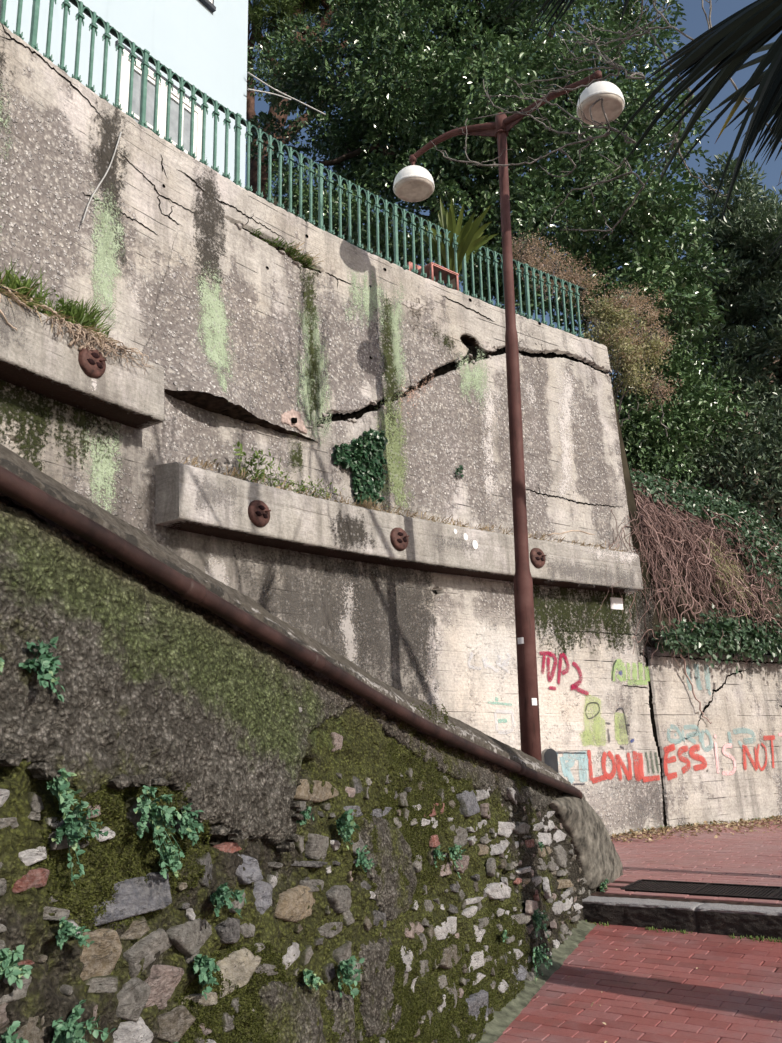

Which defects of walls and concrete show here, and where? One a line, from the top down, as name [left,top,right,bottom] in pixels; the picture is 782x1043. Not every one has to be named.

water stain [0,29,14,128]
water stain [89,101,129,275]
water stain [192,167,227,289]
crack [82,153,362,289]
crack [308,295,612,433]
water stain [3,398,58,471]
water stain [554,613,577,663]
water stain [607,585,657,661]
crack [553,629,782,827]
flaking render [359,816,417,921]
flaking render [258,937,402,1043]